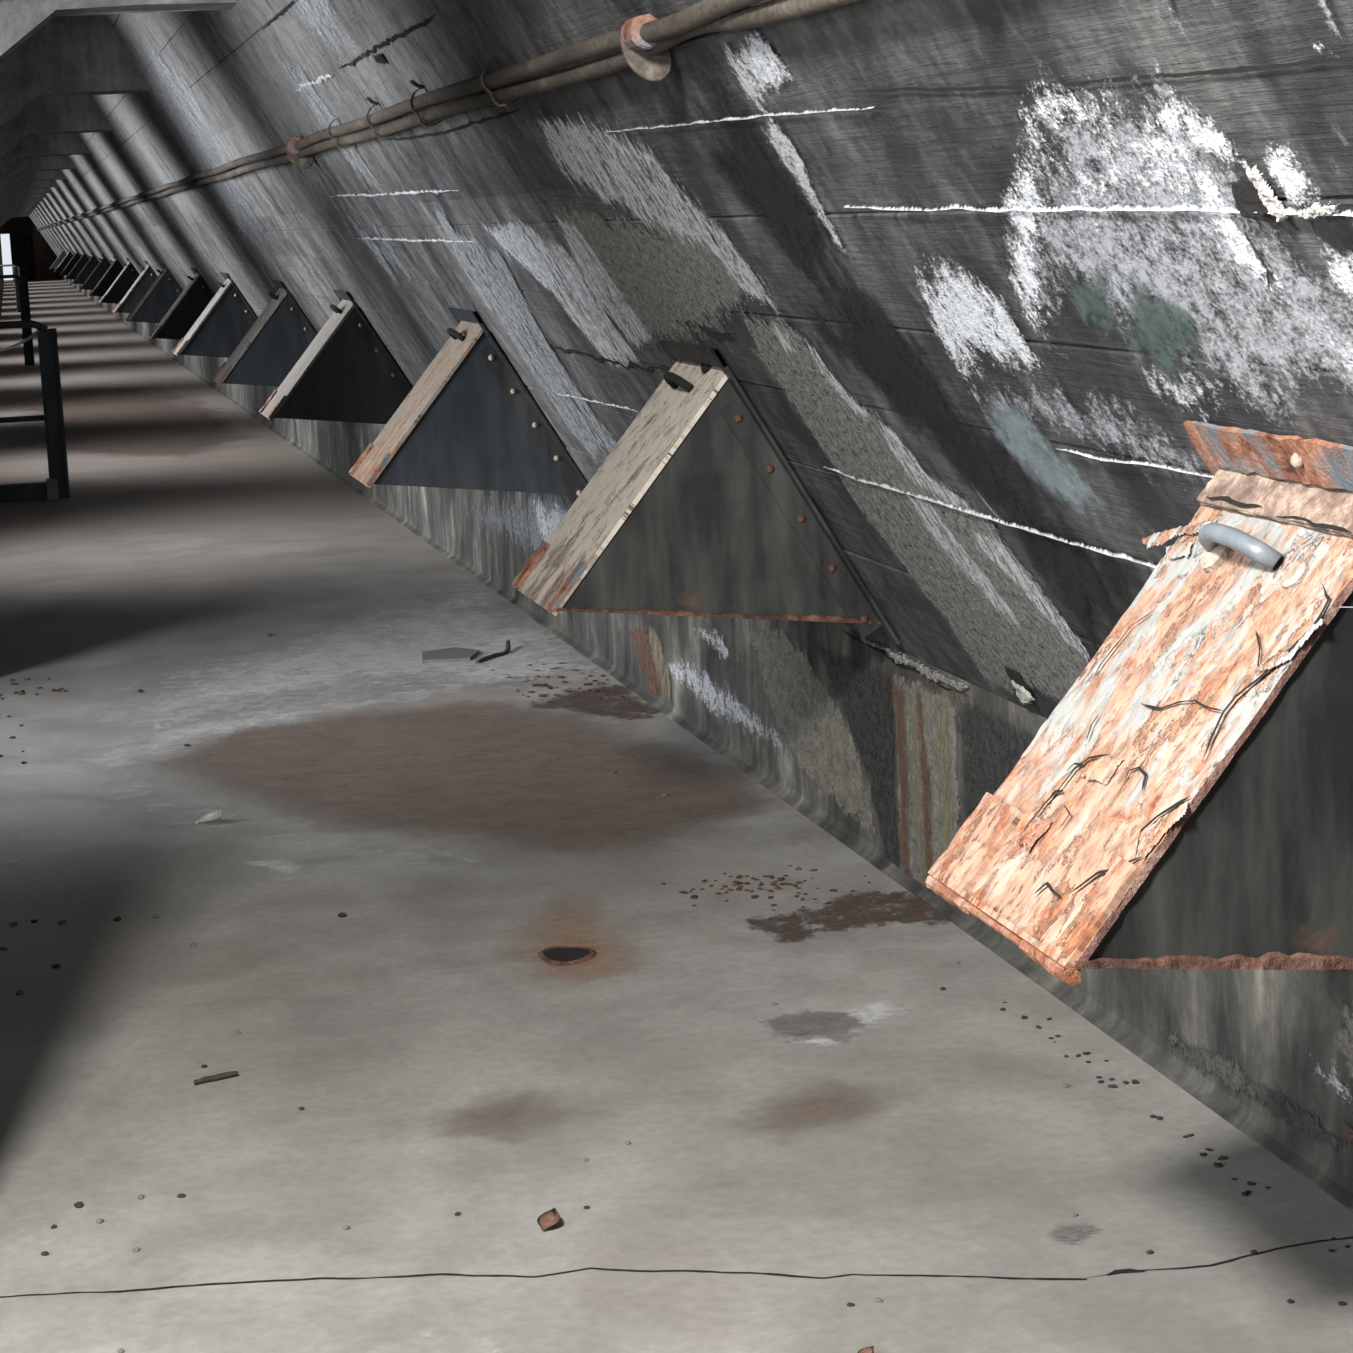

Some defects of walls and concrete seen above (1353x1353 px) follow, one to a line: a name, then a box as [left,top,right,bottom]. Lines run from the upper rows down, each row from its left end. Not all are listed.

crack [261,0,297,30]
crack [338,0,444,69]
water stain [915,64,1353,422]
peeling [1231,165,1353,256]
water stain [704,33,1196,652]
water stain [192,593,586,700]
water stain [698,630,728,659]
water stain [668,659,786,754]
water stain [175,702,752,845]
rust [530,908,620,976]
rust [1075,952,1353,970]
crack [0,1236,1353,1297]